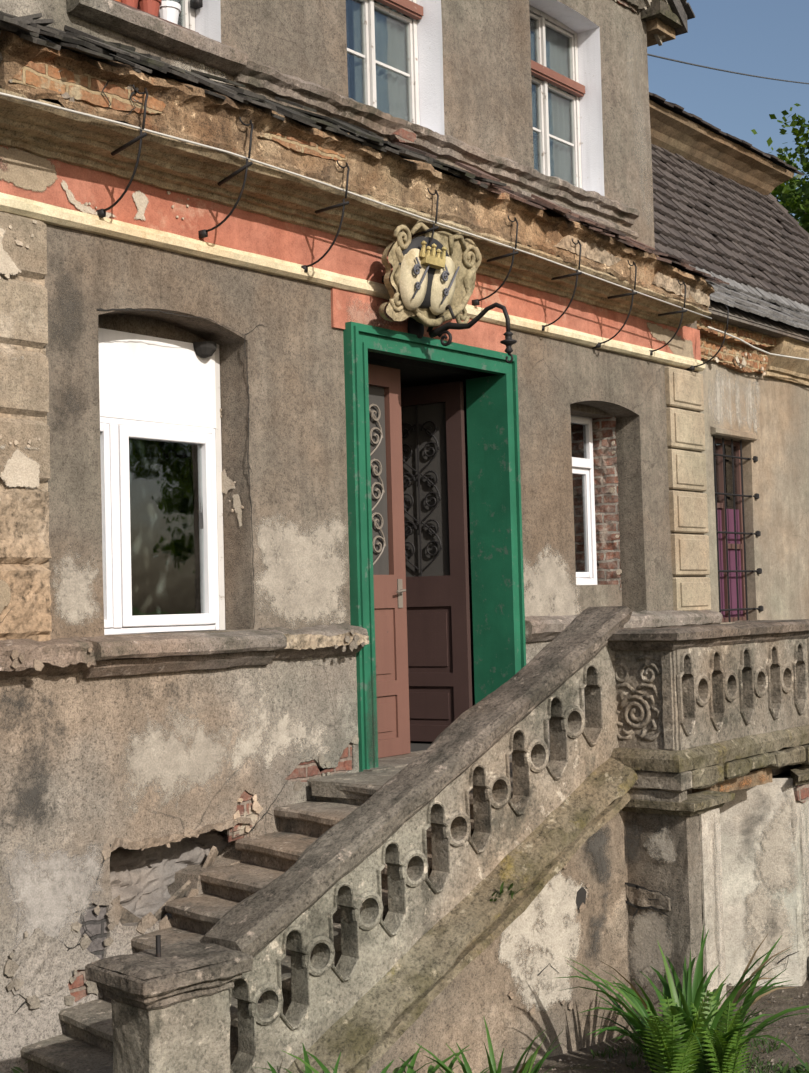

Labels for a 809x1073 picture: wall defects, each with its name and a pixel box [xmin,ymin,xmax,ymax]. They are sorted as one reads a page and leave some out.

spalling [8,61,166,114]
flaking render [0,147,115,218]
flaking render [0,220,37,279]
flaking render [647,272,777,375]
flaking render [0,434,40,488]
peeling [221,469,244,527]
flaking render [256,514,365,652]
damp [2,729,49,826]
spalling [101,791,264,860]
spalling [70,895,122,959]
flaking render [499,864,590,1016]
spalling [64,969,99,1006]